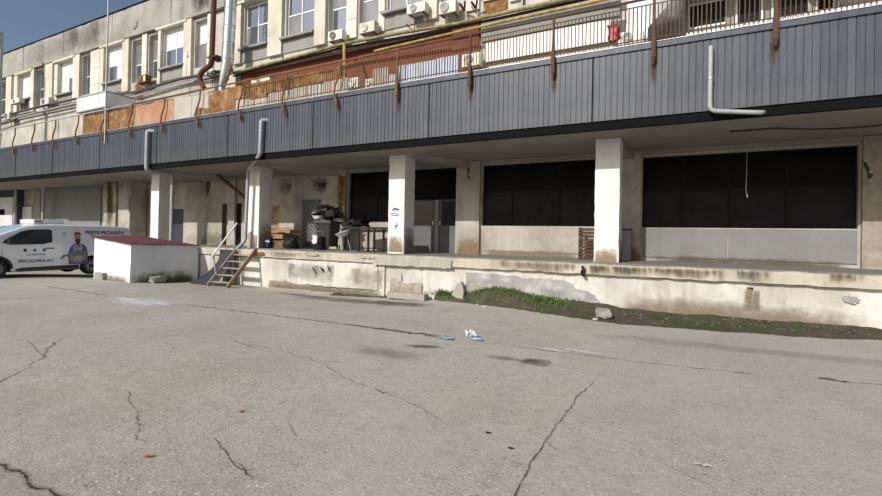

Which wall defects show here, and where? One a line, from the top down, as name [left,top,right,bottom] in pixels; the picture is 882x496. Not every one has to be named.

water stain [590,266,721,274]
water stain [745,289,759,308]
crack [512,384,592,496]
crack [214,438,251,476]
crack [0,464,60,496]